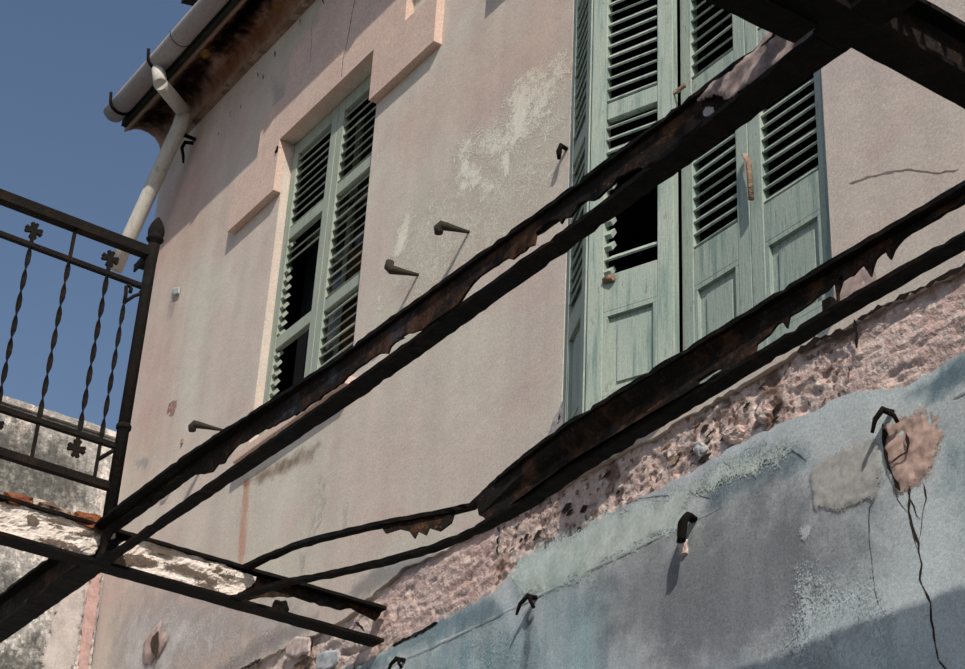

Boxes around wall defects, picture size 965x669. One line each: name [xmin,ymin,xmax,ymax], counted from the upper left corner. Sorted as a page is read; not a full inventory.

damp [132,97,166,128]
damp [172,0,248,93]
crack [849,169,958,184]
spalling [167,400,177,416]
spalling [250,269,965,669]
damp [379,433,799,669]
damp [756,524,952,669]
crack [868,483,946,669]